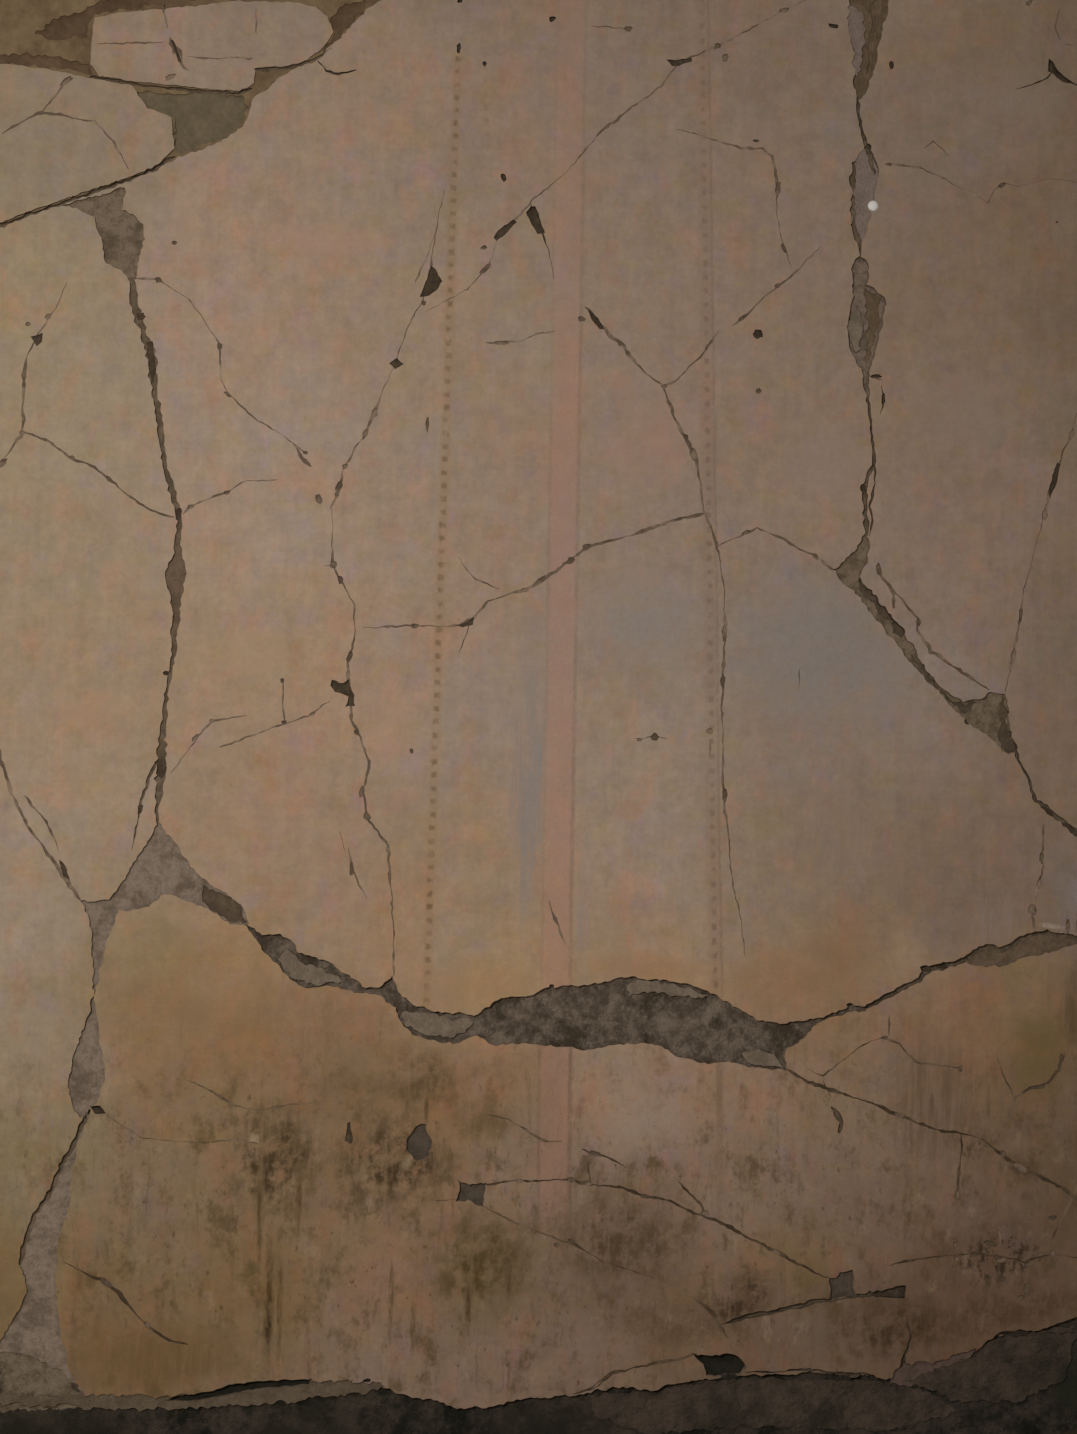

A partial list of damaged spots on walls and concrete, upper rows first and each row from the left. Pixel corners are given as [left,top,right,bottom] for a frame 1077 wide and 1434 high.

peeling [0,0,333,284]
flaking render [847,149,886,404]
crack [0,0,834,974]
flaking render [833,534,1018,754]
crack [860,374,1077,692]
crack [18,1080,320,1265]
leakage [236,1108,313,1352]
leakage [339,1057,453,1203]
leakage [436,1219,521,1322]
flaking render [0,823,1077,1434]
leakage [563,1200,678,1275]
crack [435,750,1077,1395]